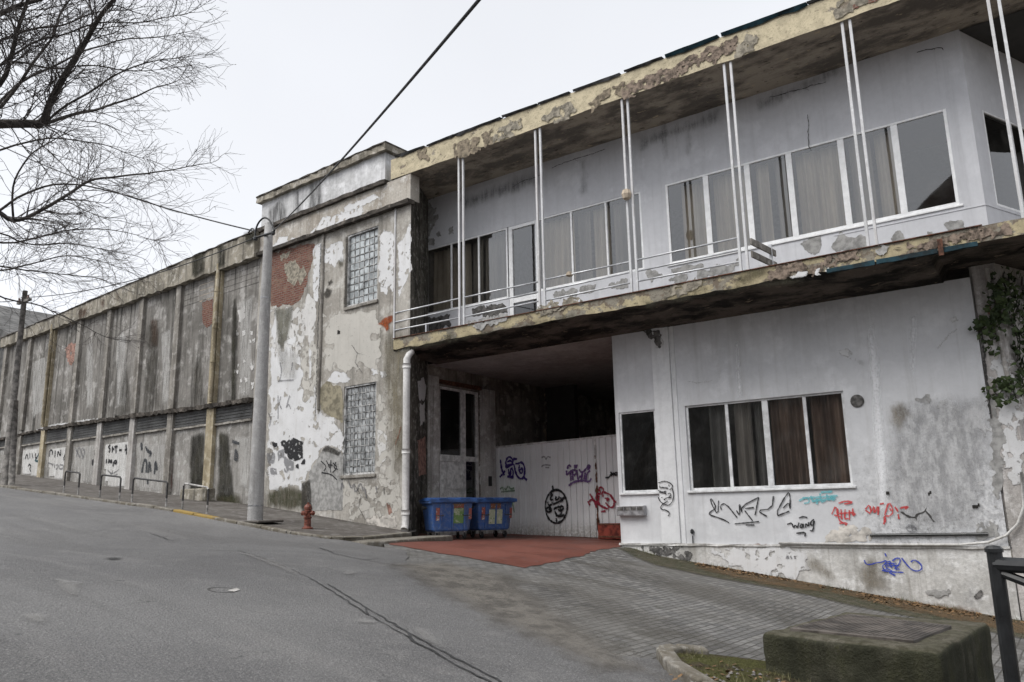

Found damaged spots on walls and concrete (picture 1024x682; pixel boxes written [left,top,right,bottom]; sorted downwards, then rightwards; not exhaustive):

spalling [541,31,759,124]
spalling [646,258,739,301]
spalling [767,220,1013,281]
damp [25,359,45,417]
damp [145,328,170,405]
damp [231,299,251,400]
peeling [267,194,402,528]
damp [190,434,204,489]
damp [217,433,232,501]
damp [870,335,986,525]
peeling [985,348,1024,508]
peeling [711,546,810,580]